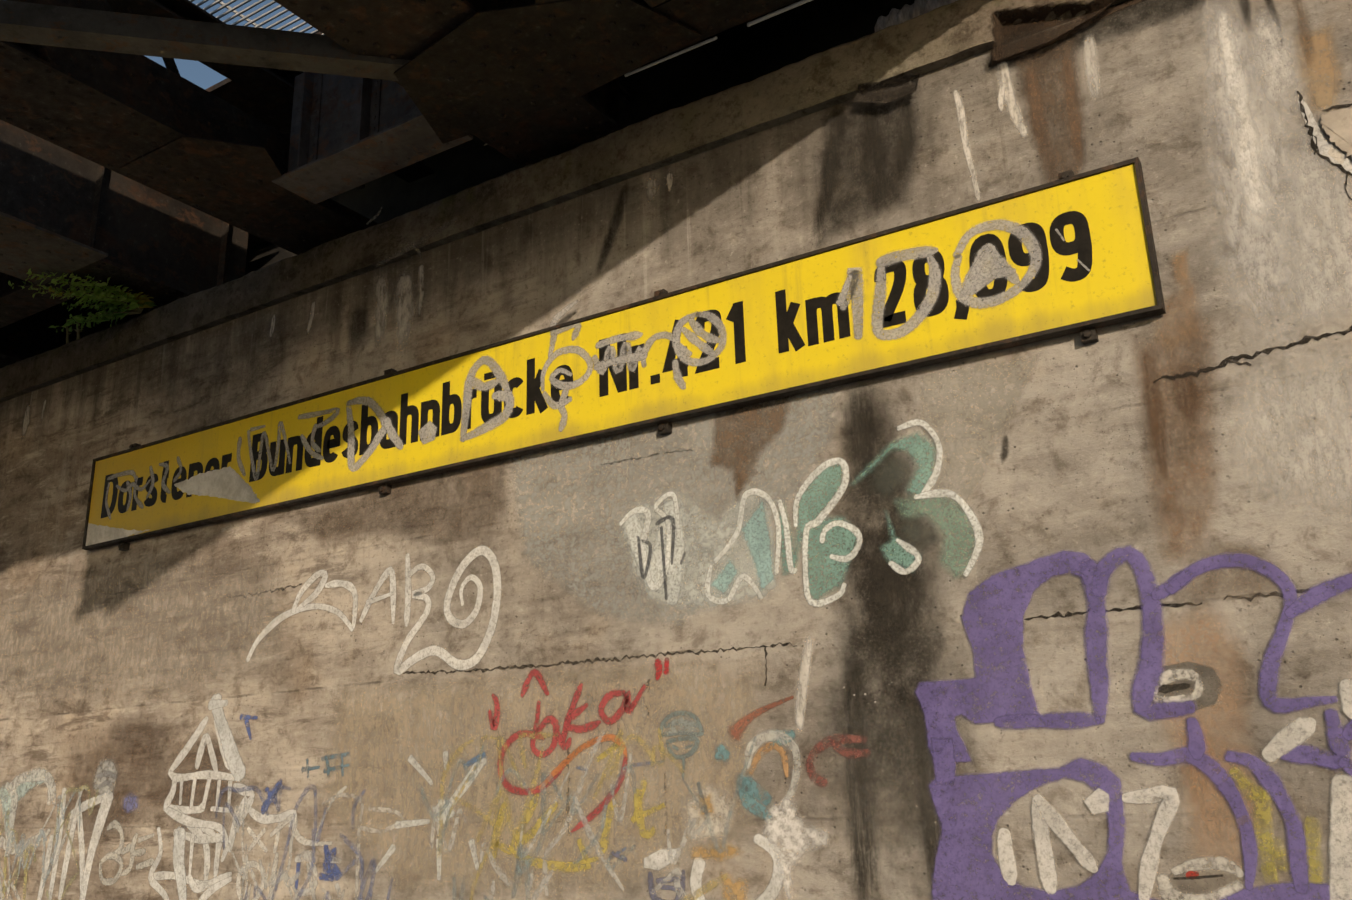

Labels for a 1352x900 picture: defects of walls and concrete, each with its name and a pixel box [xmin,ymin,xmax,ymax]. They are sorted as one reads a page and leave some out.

water stain [817,98,915,233]
crack [1297,91,1352,200]
peeling [1298,100,1352,173]
crack [1153,326,1352,383]
corrosion [1140,329,1210,551]
crack [403,642,797,715]
water stain [842,396,950,895]
crack [1024,587,1328,620]